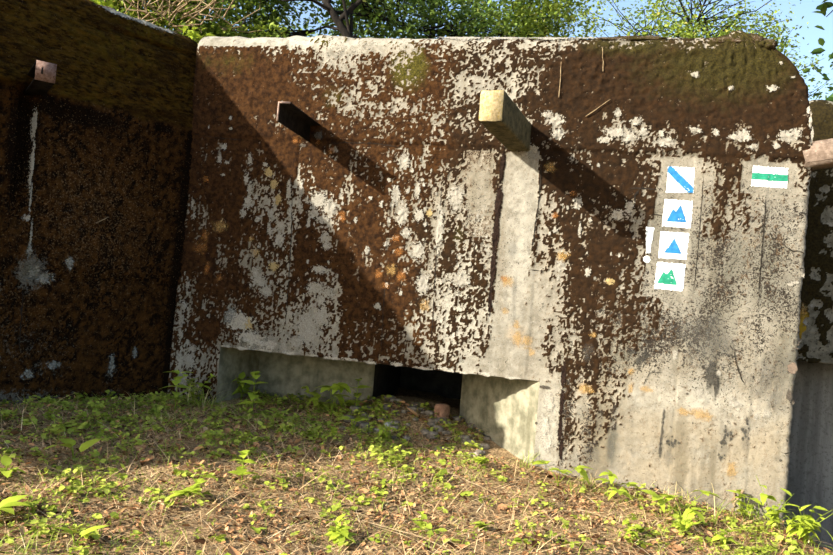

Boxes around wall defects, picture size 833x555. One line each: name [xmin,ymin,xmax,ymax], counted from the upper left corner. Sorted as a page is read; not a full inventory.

peeling [541,110,566,140]
peeling [597,108,648,144]
peeling [656,130,676,148]
peeling [689,127,759,151]
peeling [772,106,814,149]
efflorescence [21,106,38,243]
peeling [398,152,422,173]
peeling [240,152,344,298]
peeling [368,178,482,303]
peeling [605,200,636,221]
spalling [221,259,376,364]
spalling [390,362,468,374]